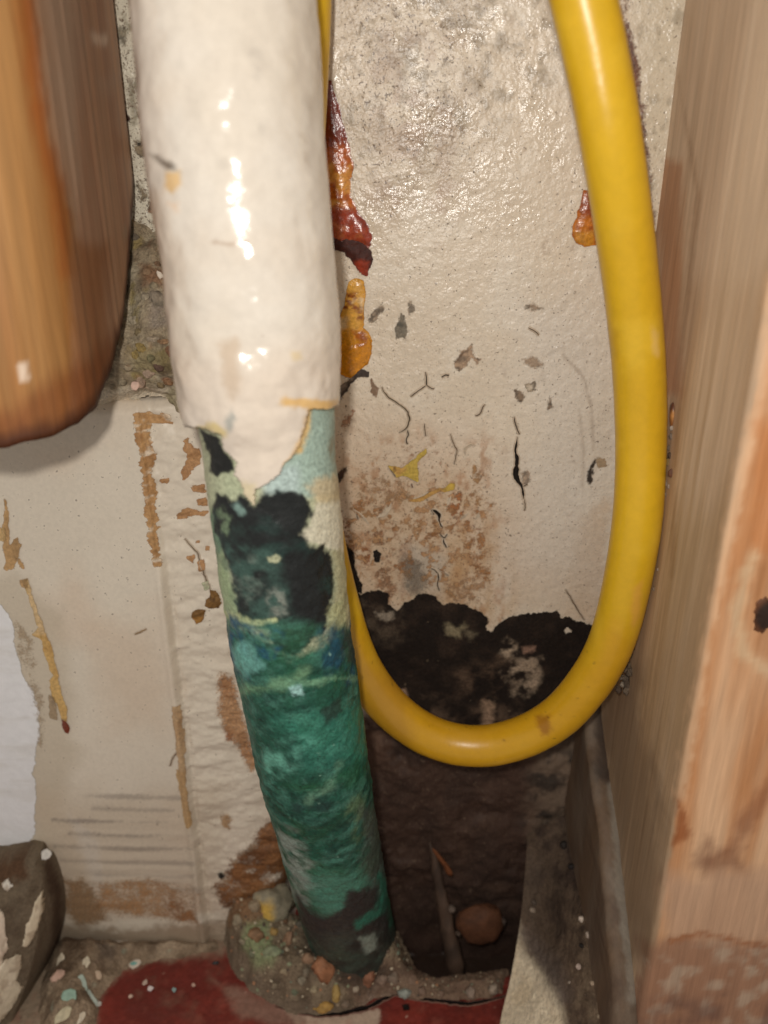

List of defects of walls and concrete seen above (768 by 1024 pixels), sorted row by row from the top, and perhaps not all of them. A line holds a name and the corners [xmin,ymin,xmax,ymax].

corrosion [325,80,373,378]
corrosion [572,190,596,247]
peeling [339,369,379,403]
peeling [395,301,415,339]
crack [380,372,459,465]
peeling [454,344,481,371]
peeling [177,438,209,519]
crack [511,416,528,511]
peeling [0,499,70,734]
peeling [191,590,222,624]
water stain [341,465,592,725]
water stain [214,822,287,908]